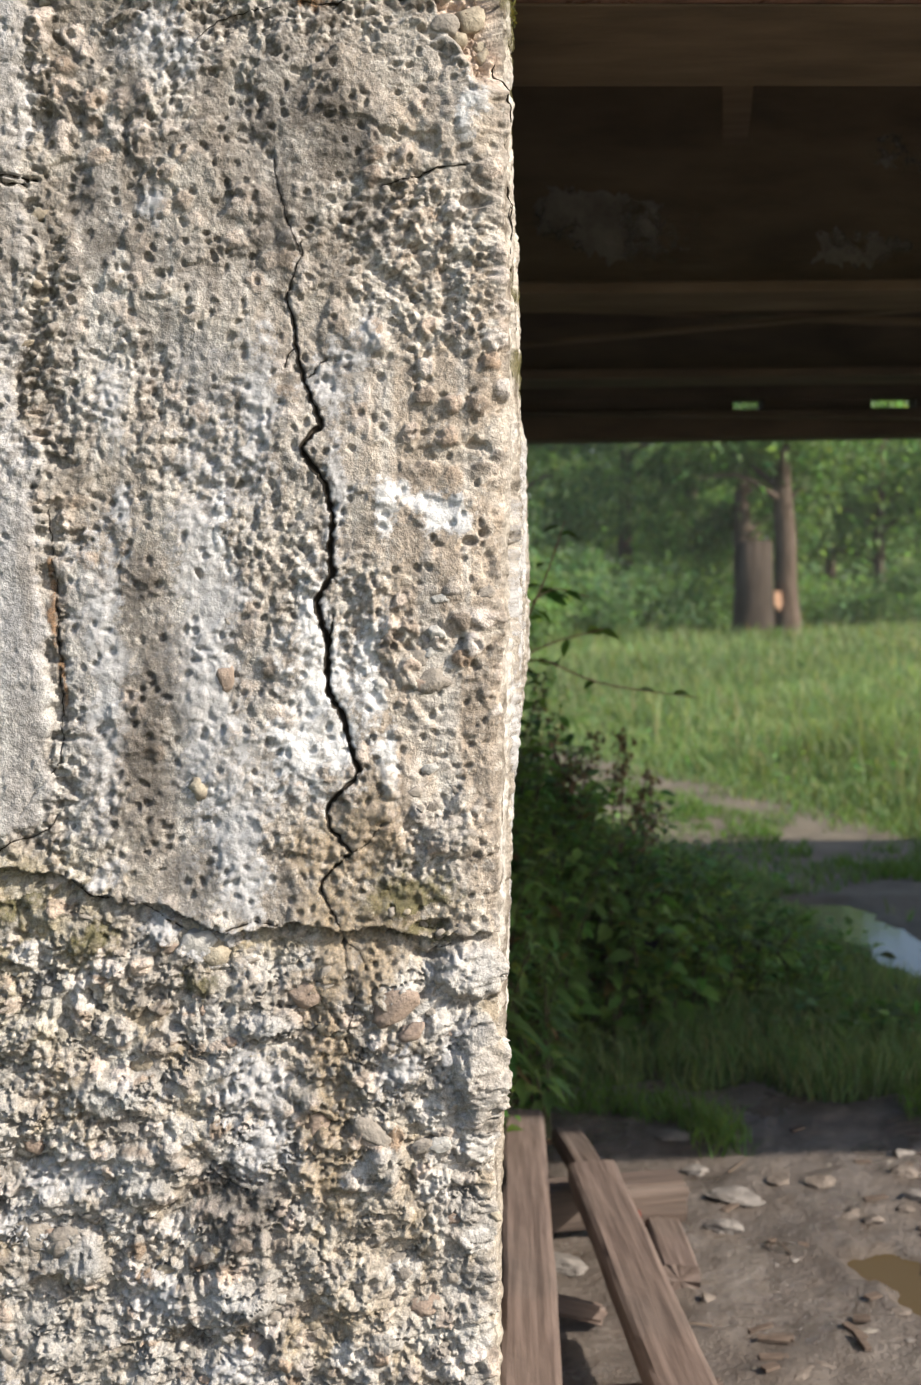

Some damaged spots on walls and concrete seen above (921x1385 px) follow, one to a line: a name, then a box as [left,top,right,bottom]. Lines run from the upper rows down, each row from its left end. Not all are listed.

crack [174,0,344,69]
crack [381,164,466,186]
crack [48,509,65,774]
crack [274,157,377,1071]
crack [0,816,58,851]